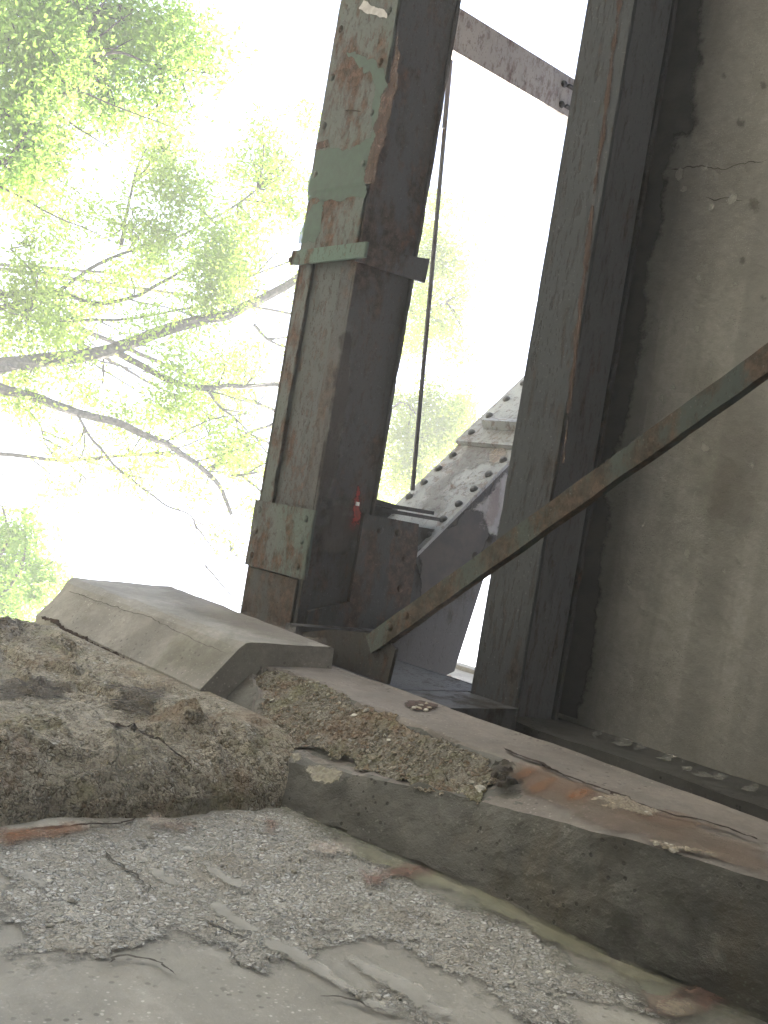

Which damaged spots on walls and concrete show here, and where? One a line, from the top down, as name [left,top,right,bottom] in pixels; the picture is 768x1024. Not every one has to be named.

peeling [298,51,388,244]
corrosion [364,36,401,185]
corrosion [319,332,352,501]
corrosion [419,509,489,596]
crack [41,616,125,658]
crack [69,591,225,653]
corrosion [0,822,81,844]
crack [111,723,192,768]
spalling [255,670,495,805]
corrosion [491,759,557,793]
crack [505,748,758,840]
spalling [0,808,696,1024]